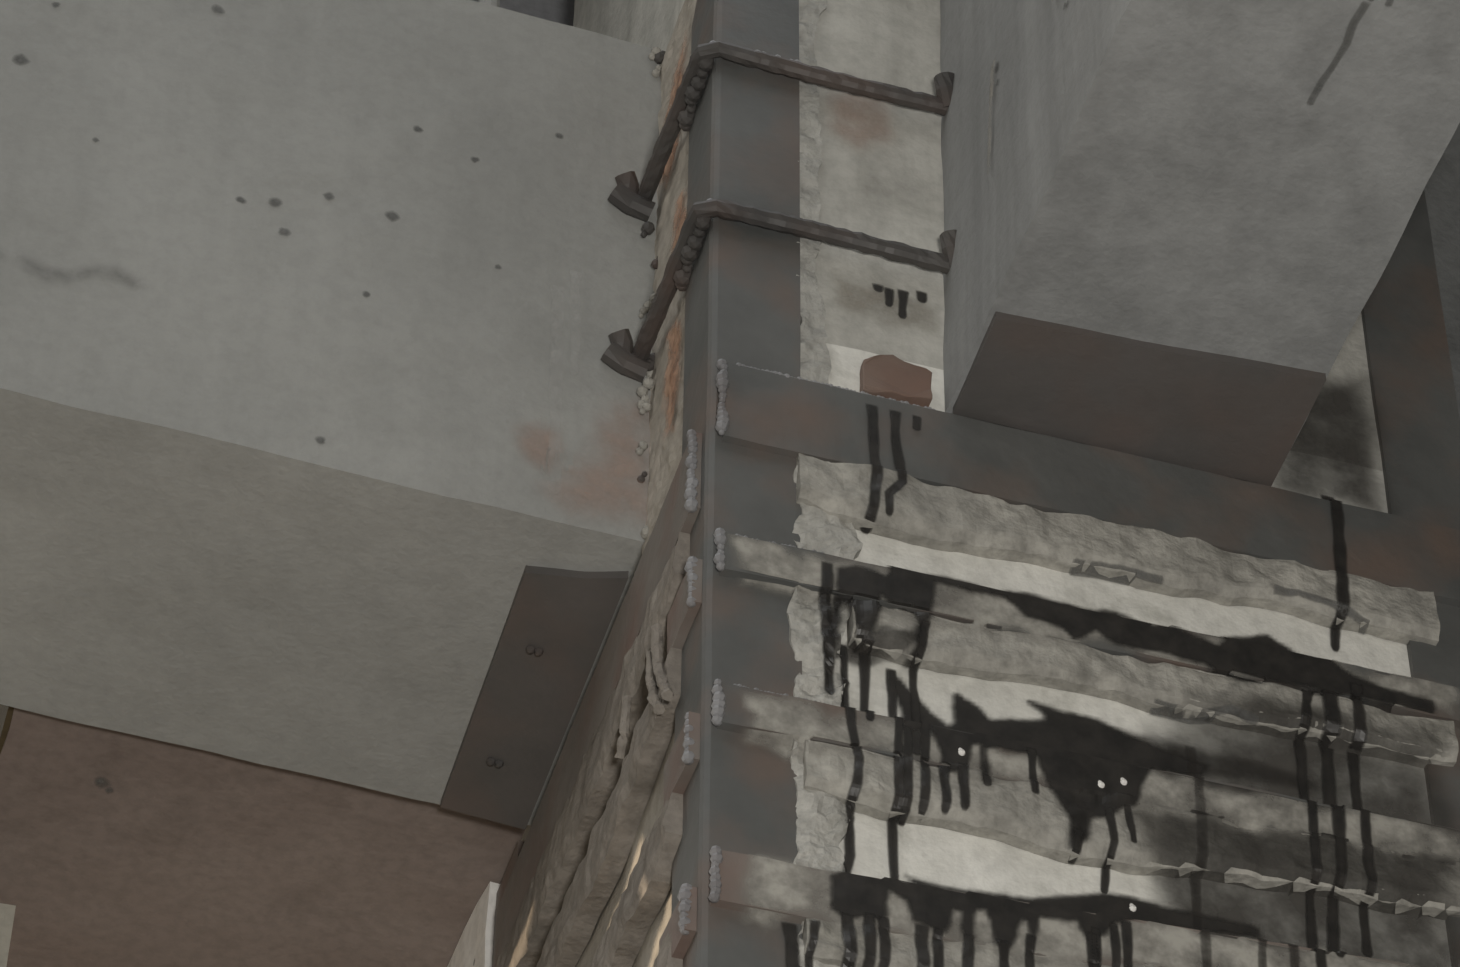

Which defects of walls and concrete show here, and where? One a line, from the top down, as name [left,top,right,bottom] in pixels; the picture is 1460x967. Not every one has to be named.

spalling [635,0,697,554]
crack [1310,3,1369,104]